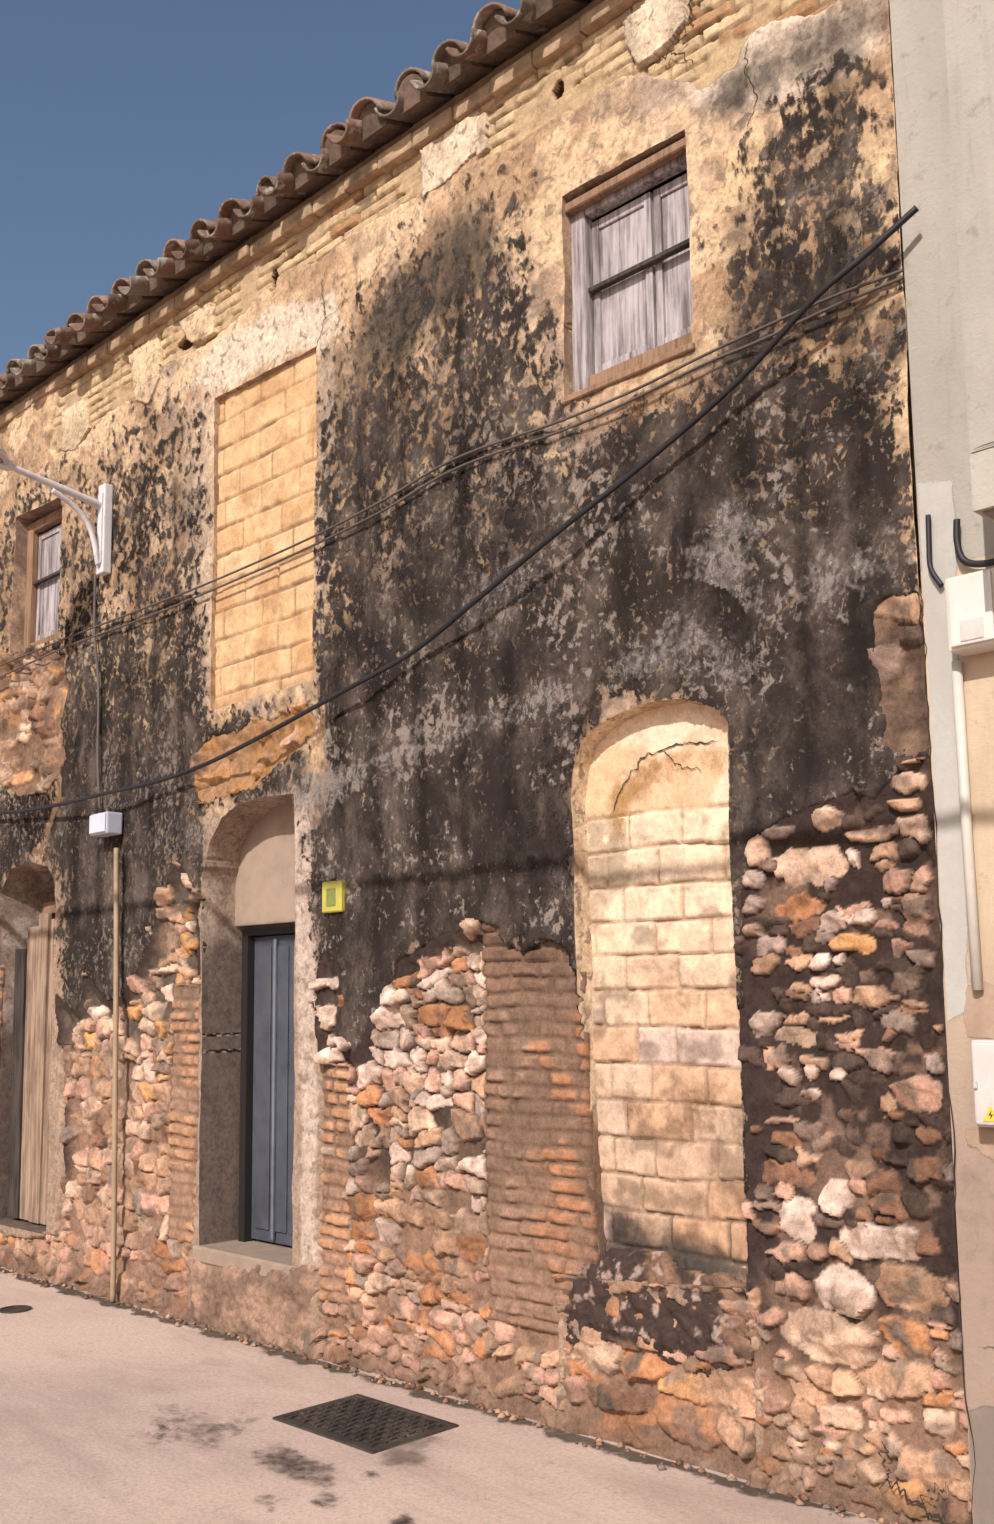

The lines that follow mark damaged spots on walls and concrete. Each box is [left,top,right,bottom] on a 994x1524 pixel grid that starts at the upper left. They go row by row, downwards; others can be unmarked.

flaking render [50,0,838,456]
water stain [0,47,924,1052]
crack [610,740,718,817]
water stain [740,1069,750,1195]
crack [878,575,994,1524]